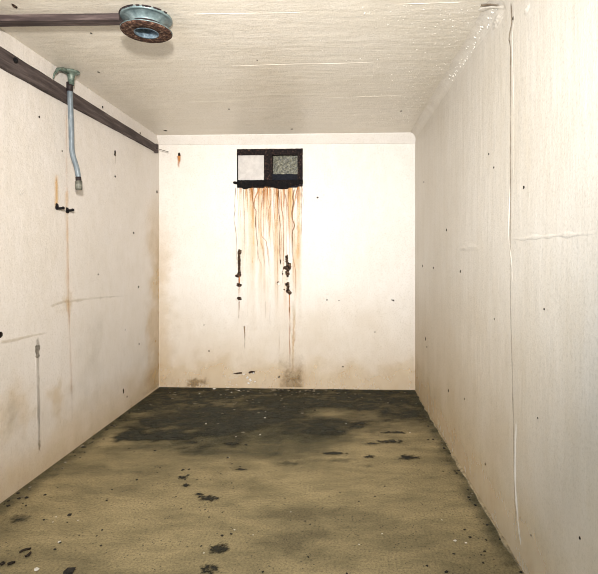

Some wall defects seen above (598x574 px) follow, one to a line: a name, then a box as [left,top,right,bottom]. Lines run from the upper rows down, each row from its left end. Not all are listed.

crack [478,4,514,91]
rust [235,187,303,252]
crack [508,127,597,285]
damp [20,375,450,490]
damp [468,492,503,544]
crack [514,420,523,553]